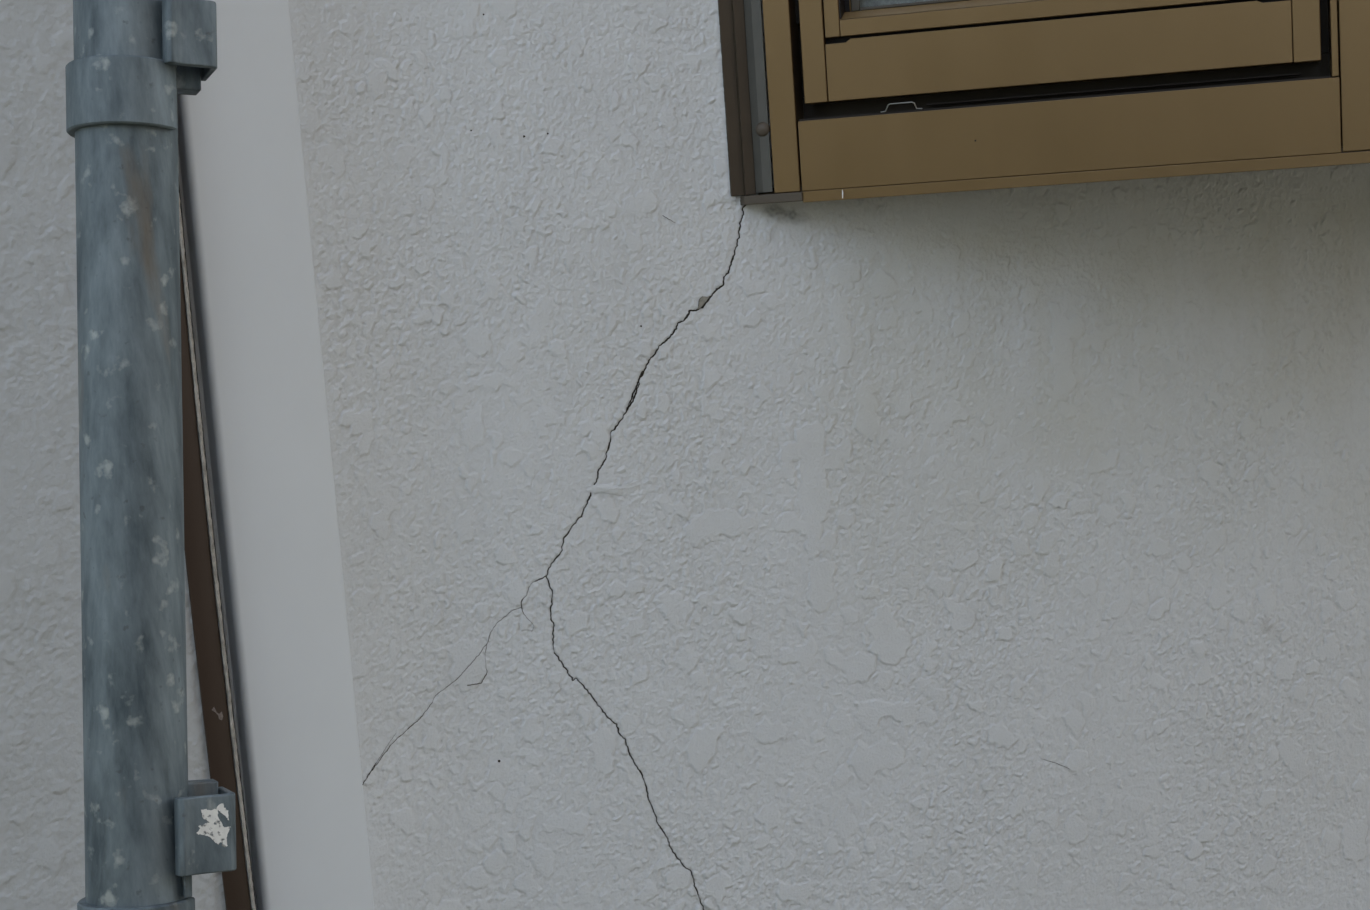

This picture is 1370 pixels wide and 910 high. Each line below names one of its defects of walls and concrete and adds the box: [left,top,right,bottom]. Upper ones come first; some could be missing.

crack [362,205,746,910]